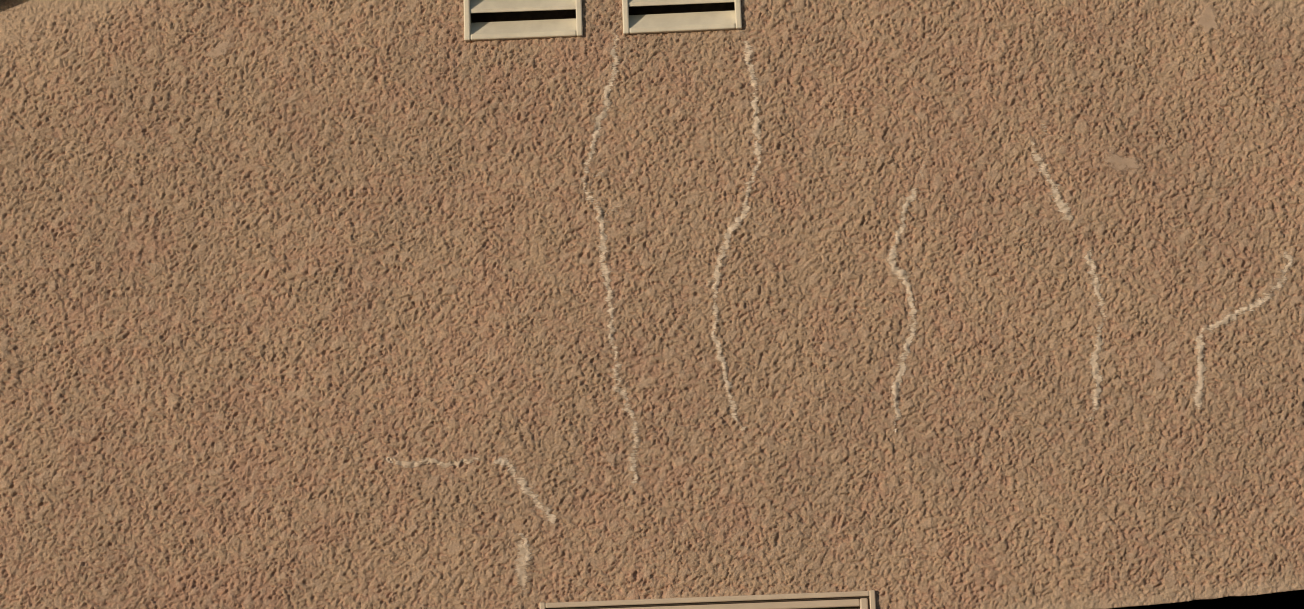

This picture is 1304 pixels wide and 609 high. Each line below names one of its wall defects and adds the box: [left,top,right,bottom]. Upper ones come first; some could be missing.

crack [580,23,640,489]
crack [703,31,764,431]
crack [886,158,928,432]
crack [1030,124,1073,220]
crack [1079,250,1107,421]
crack [1192,249,1296,409]
crack [385,455,557,523]